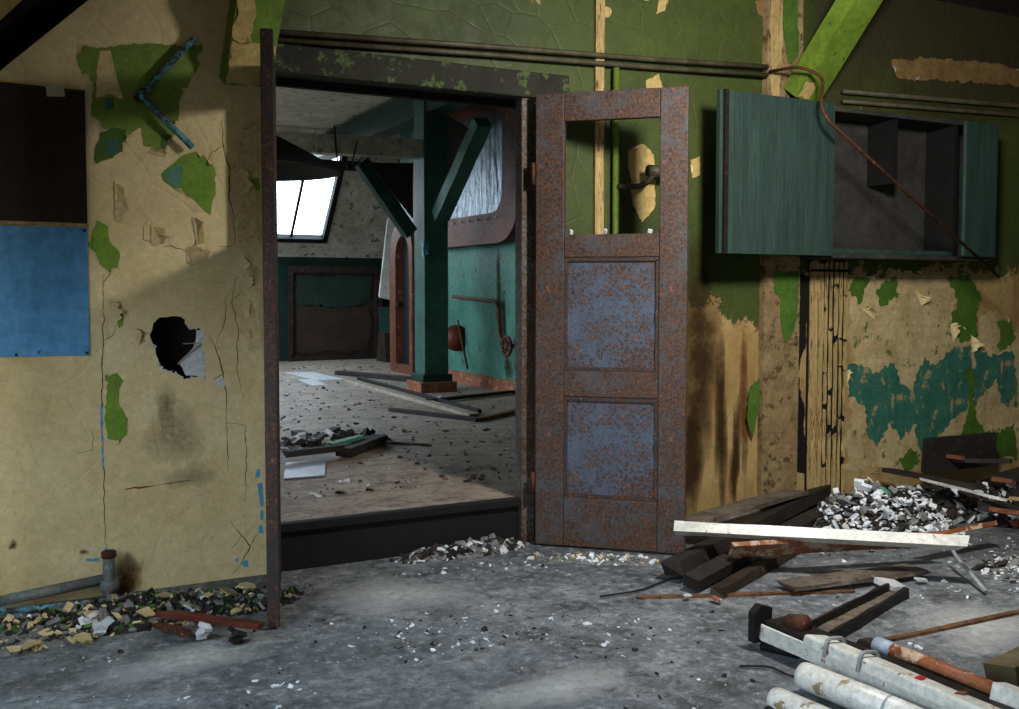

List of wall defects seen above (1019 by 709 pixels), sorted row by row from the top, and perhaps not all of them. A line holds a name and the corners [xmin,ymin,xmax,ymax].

peeling [75,43,216,274]
crack [77,268,119,547]
peeling [100,373,129,471]
peeling [117,306,157,349]
spalling [156,321,225,387]
crack [211,281,247,498]
damp [686,278,747,500]
peeling [797,260,1019,494]
crack [231,524,257,573]